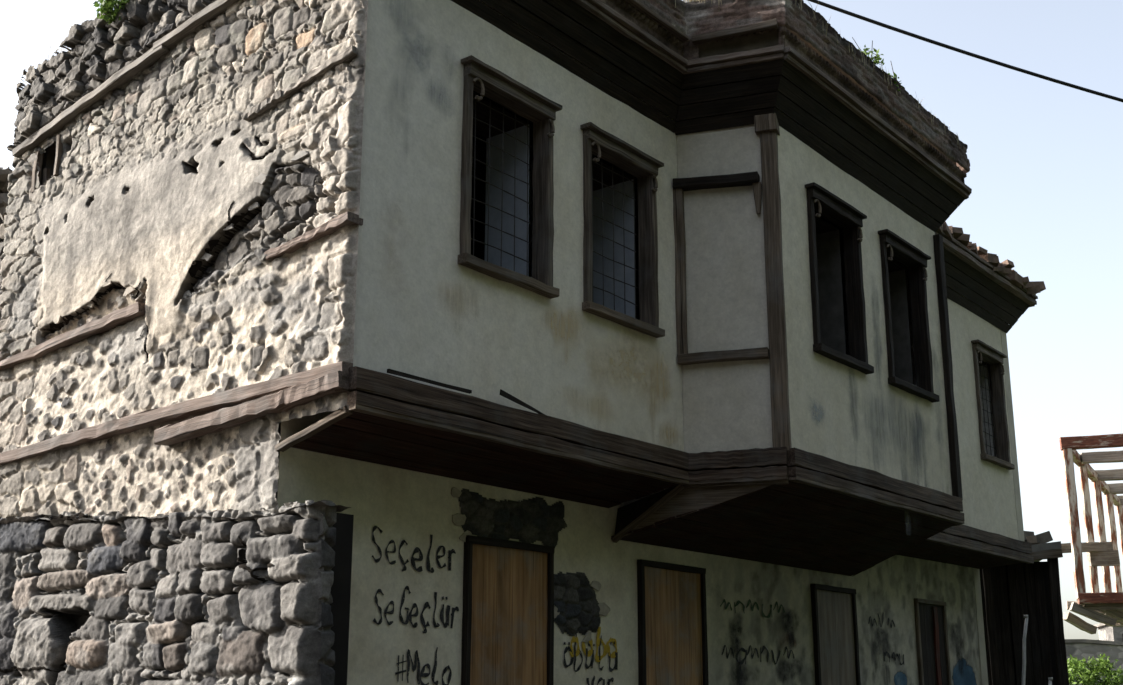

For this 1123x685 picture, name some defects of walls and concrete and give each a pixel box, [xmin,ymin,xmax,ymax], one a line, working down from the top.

flaking render [182,151,327,299]
flaking render [45,279,146,341]
flaking render [451,487,567,547]
flaking render [554,571,610,643]